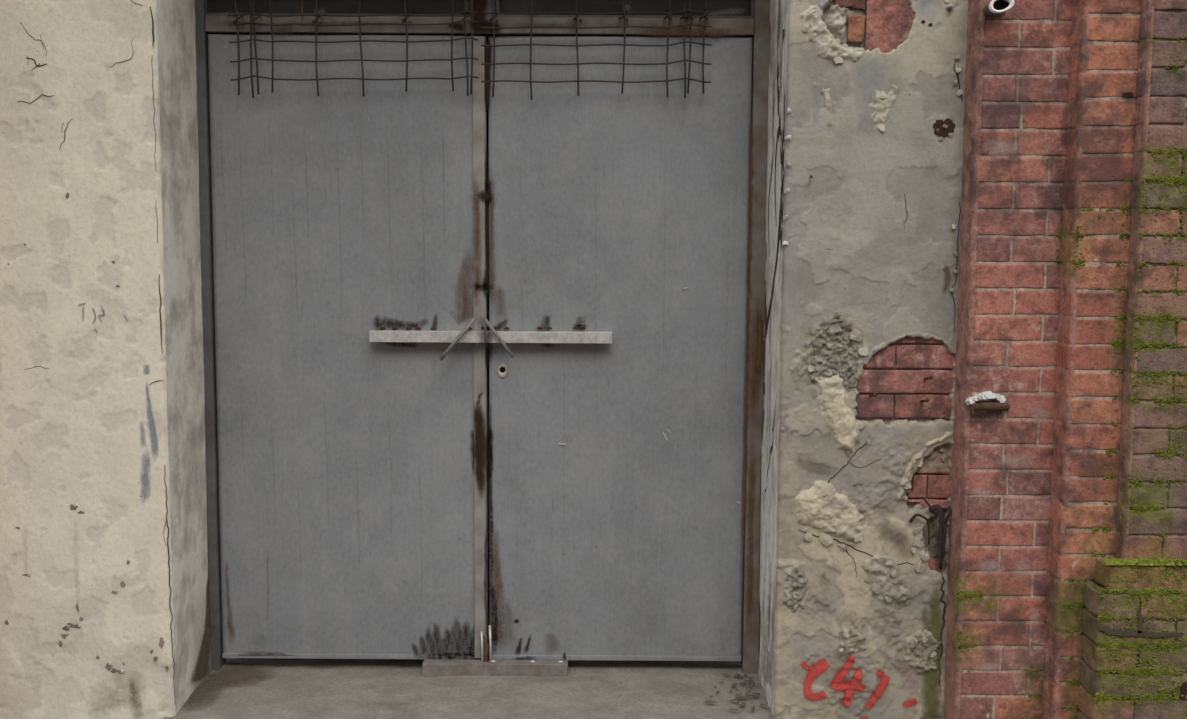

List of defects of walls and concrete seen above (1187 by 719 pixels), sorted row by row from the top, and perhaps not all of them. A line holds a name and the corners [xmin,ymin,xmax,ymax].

crack [18,22,54,104]
crack [112,0,156,167]
spalling [800,0,932,65]
peeling [868,84,900,132]
spalling [933,118,955,142]
corrosion [462,194,480,318]
crack [150,274,163,385]
spalling [789,311,955,612]
spalling [782,564,808,613]